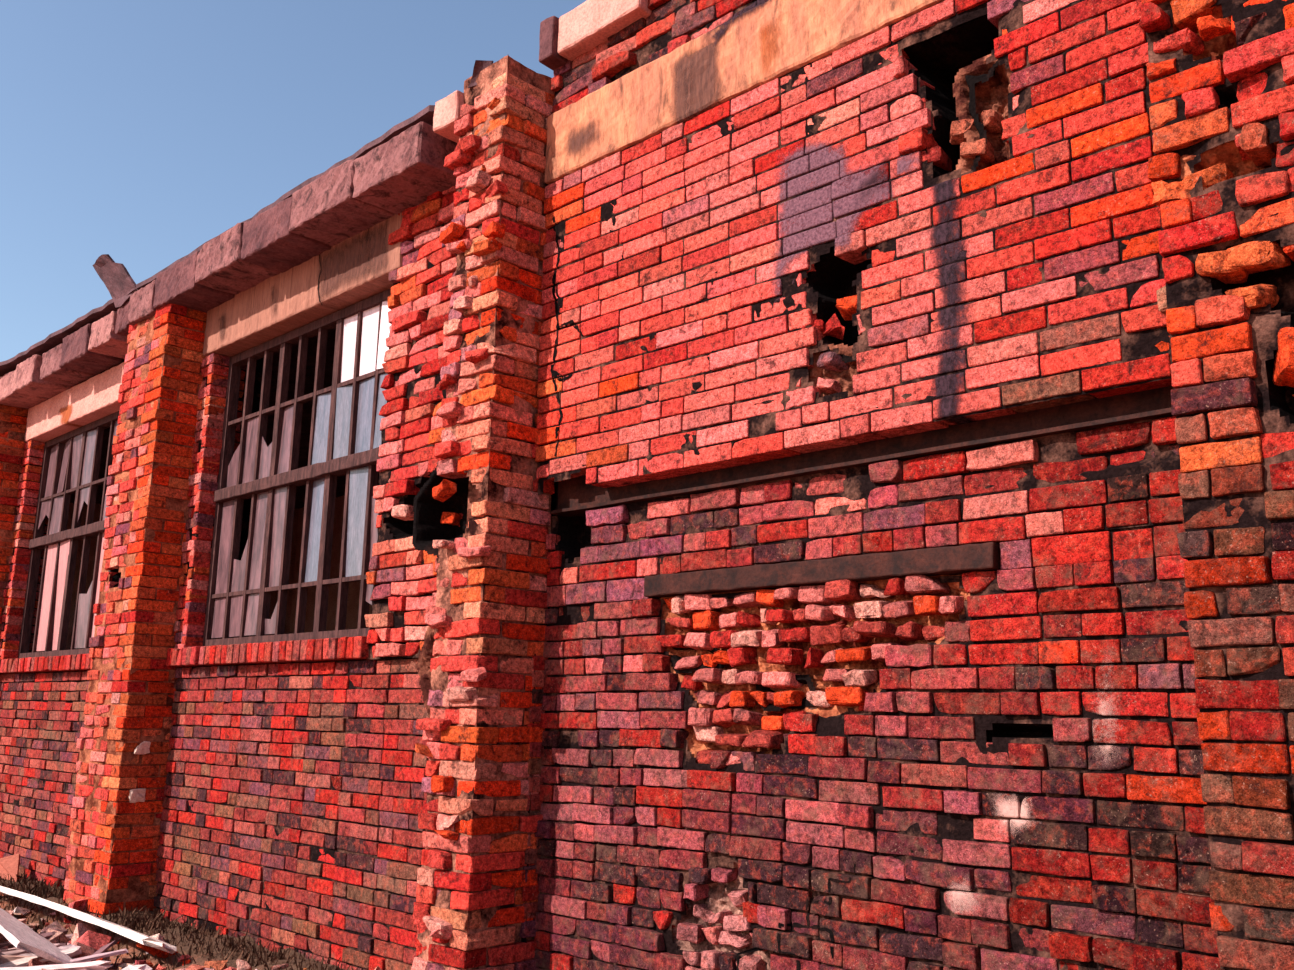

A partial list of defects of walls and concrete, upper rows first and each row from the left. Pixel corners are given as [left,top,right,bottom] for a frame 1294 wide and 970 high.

spalling [1153,4,1238,65]
spalling [903,14,1012,178]
spalling [1214,78,1243,108]
spalling [444,134,508,205]
spalling [1180,133,1272,191]
spalling [439,220,506,257]
crack [550,216,583,456]
spalling [802,246,872,397]
spalling [1195,239,1294,424]
spalling [383,466,491,558]
spalling [415,614,487,758]
spalling [986,723,1054,742]